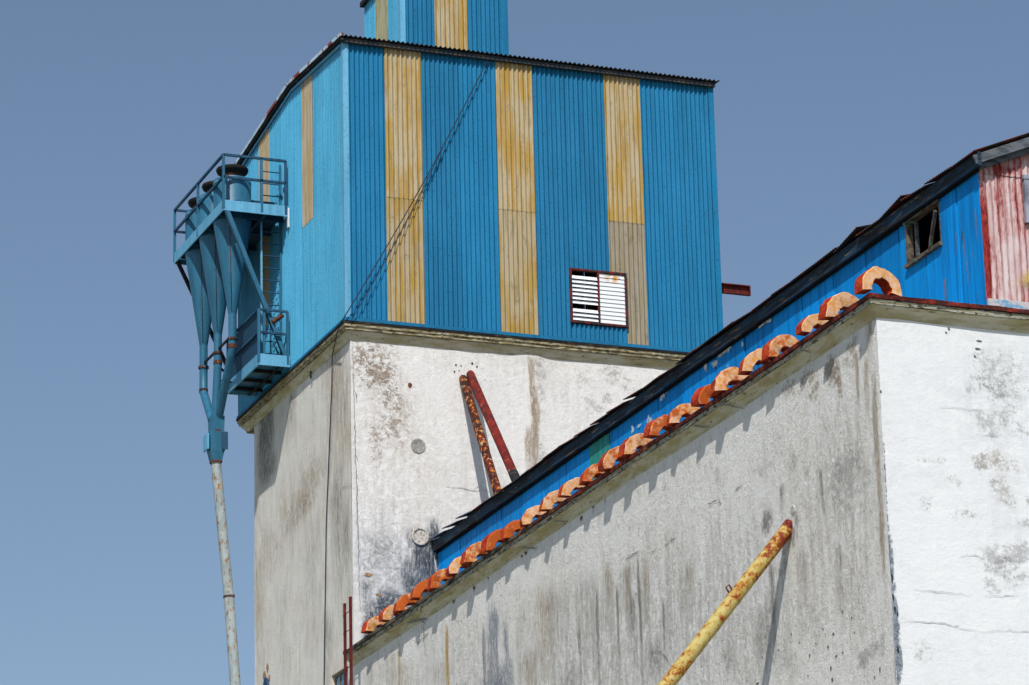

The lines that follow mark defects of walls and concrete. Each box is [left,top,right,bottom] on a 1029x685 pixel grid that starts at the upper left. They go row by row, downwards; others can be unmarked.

peeling [351,341,412,455]
damp [364,523,439,637]
damp [482,611,513,685]
damp [616,564,647,642]
crack [901,621,1029,632]